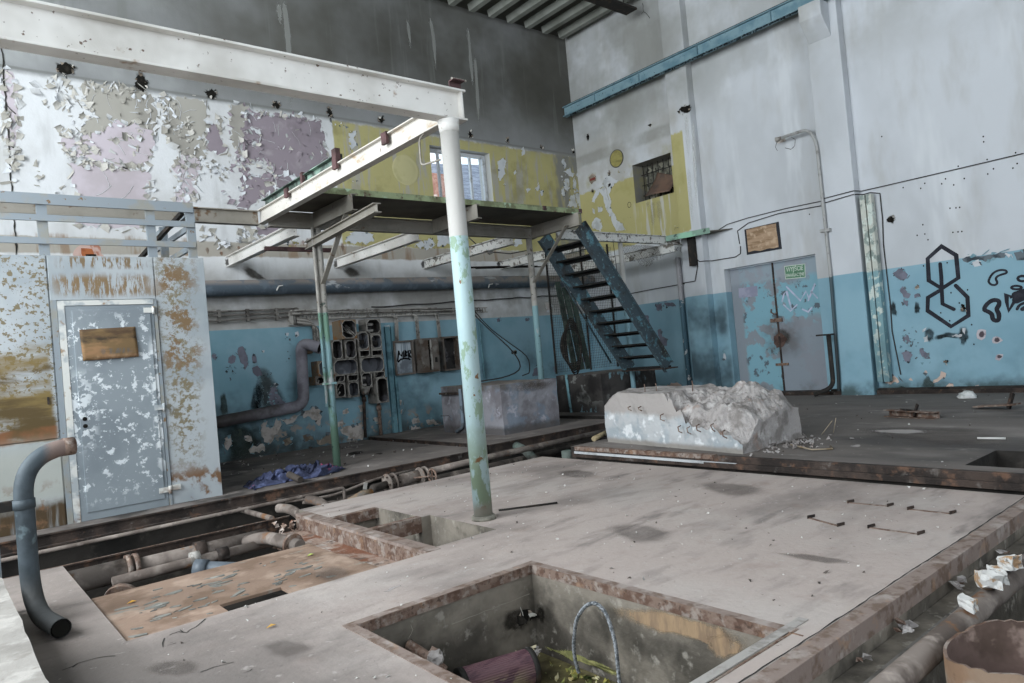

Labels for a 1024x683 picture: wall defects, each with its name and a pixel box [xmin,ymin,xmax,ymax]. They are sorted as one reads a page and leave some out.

peeling [0,61,358,210]
peeling [73,223,146,233]
peeling [199,224,278,250]
peeling [345,232,374,245]
peeling [405,235,450,250]